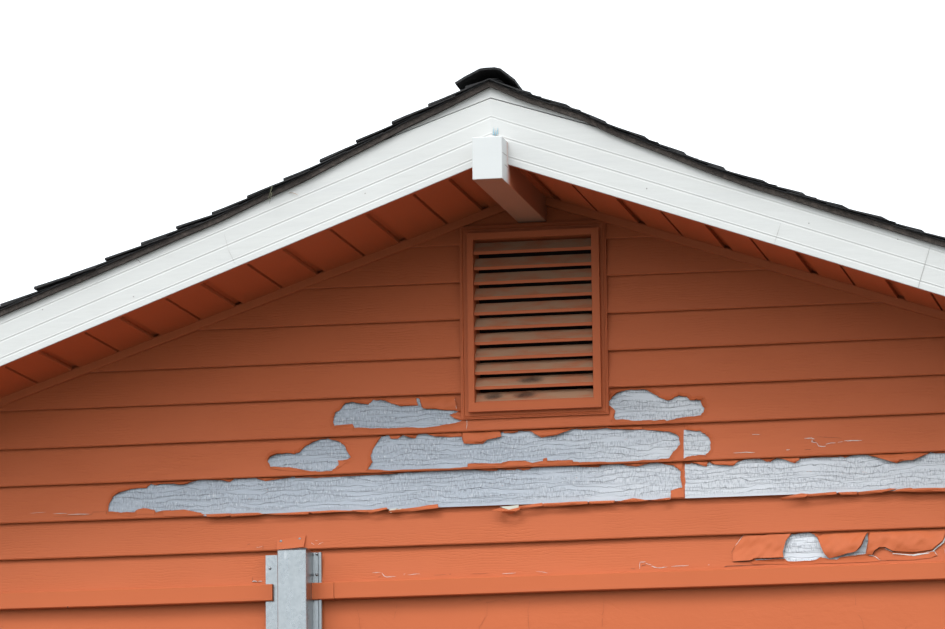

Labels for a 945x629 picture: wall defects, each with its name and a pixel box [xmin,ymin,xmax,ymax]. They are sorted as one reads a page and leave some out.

peeling [105,387,945,517]
peeling [733,529,945,566]